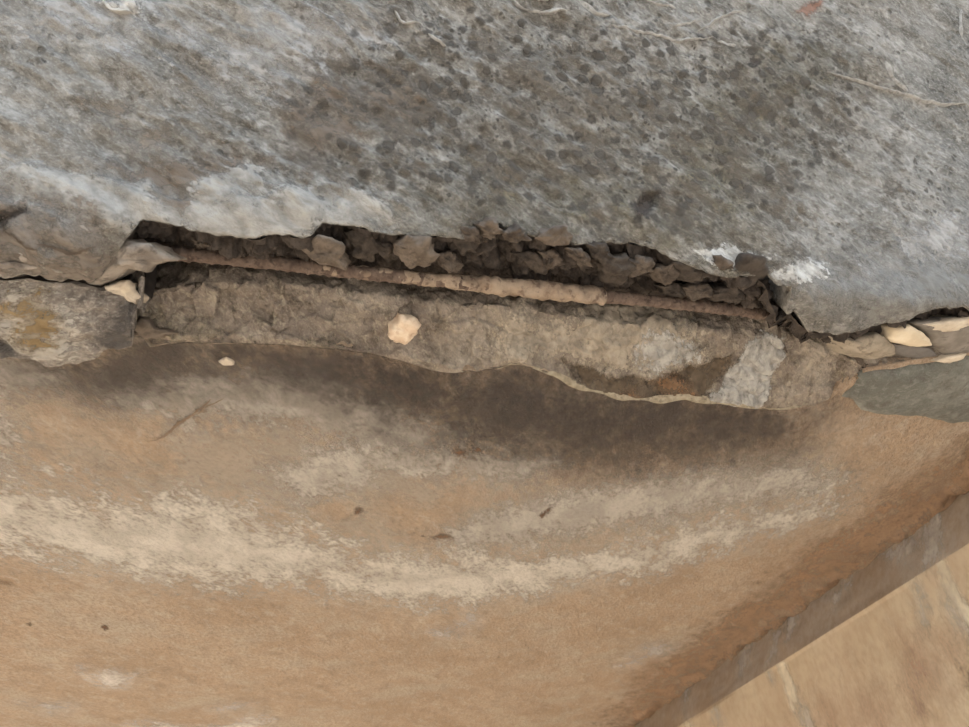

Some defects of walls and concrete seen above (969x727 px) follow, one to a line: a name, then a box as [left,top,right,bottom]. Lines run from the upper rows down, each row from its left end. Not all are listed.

spalling [328,9,858,224]
crack [2,224,96,256]
crack [0,266,157,299]
spalling [105,217,969,410]
leakage [693,242,753,267]
leakage [0,302,851,636]